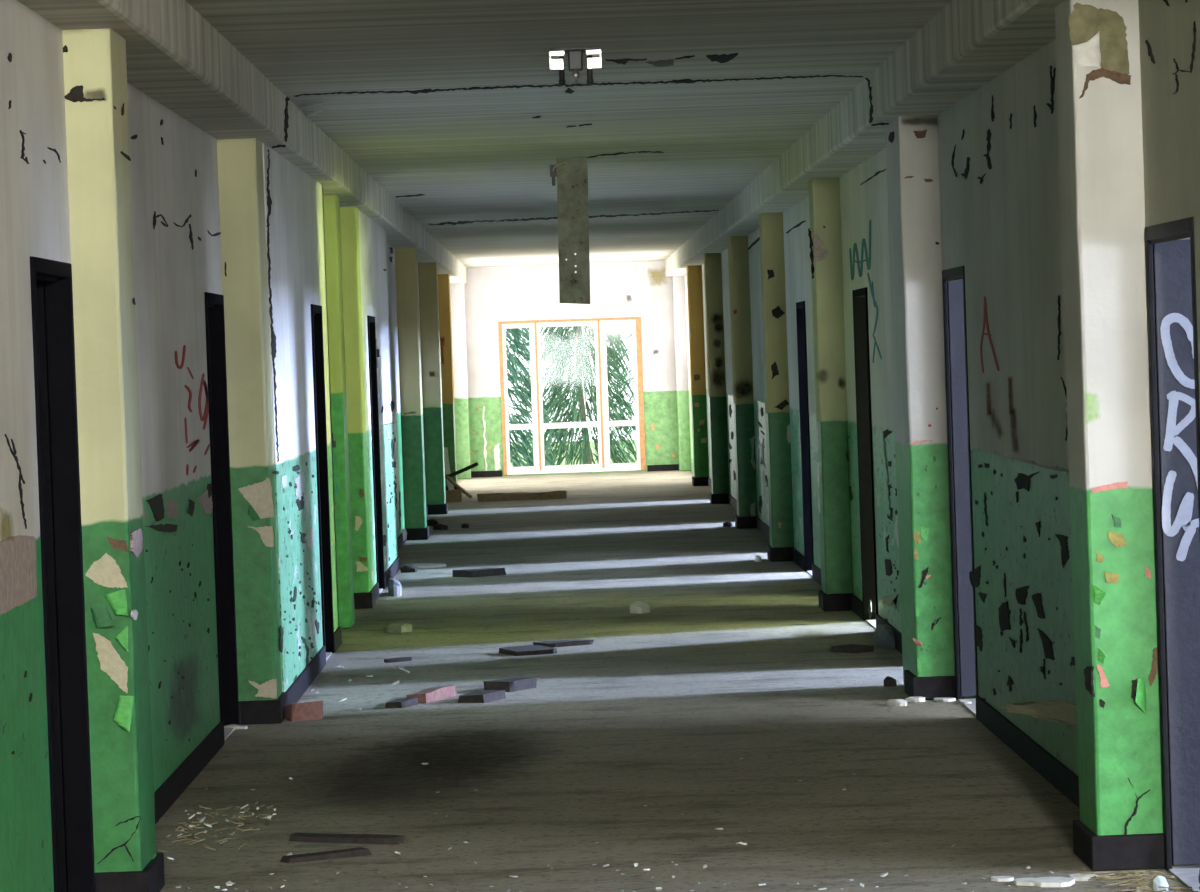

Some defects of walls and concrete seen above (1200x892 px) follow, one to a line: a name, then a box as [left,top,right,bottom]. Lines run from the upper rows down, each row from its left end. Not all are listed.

peeling [1068,3,1132,99]
flaking render [64,85,124,116]
crack [951,104,994,184]
crack [266,75,894,462]
crack [5,434,27,529]
flaking render [0,535,37,614]
peeling [86,483,213,732]
peeling [238,462,320,682]
peeling [969,491,1062,685]
flaking render [1070,625,1110,709]
crack [97,816,141,864]
crack [1124,778,1150,835]